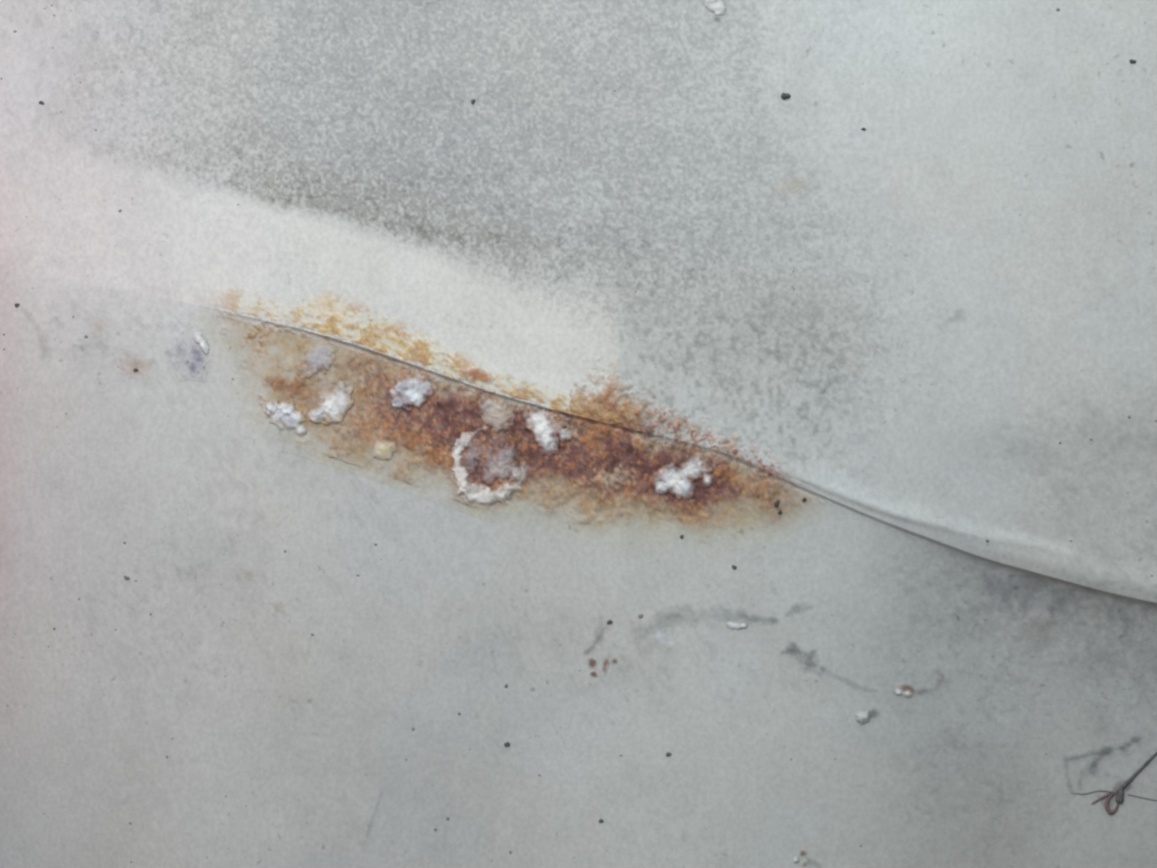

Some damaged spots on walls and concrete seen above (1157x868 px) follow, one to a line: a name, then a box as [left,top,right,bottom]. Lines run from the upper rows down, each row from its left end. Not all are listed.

rust [187,285,838,561]